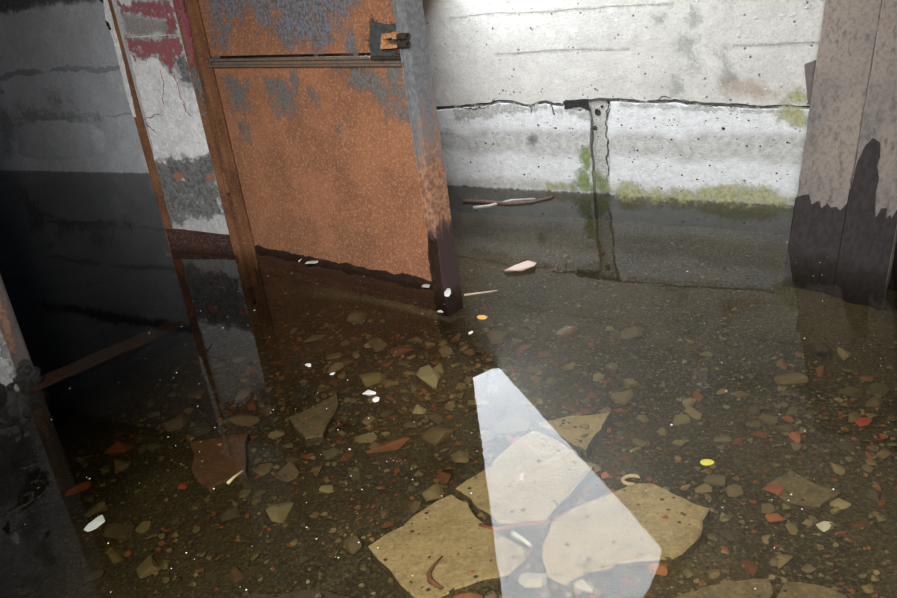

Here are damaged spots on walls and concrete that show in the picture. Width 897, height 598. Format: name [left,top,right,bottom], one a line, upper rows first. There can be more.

peeling [100,0,210,183]
crack [460,99,564,114]
crack [588,96,805,182]